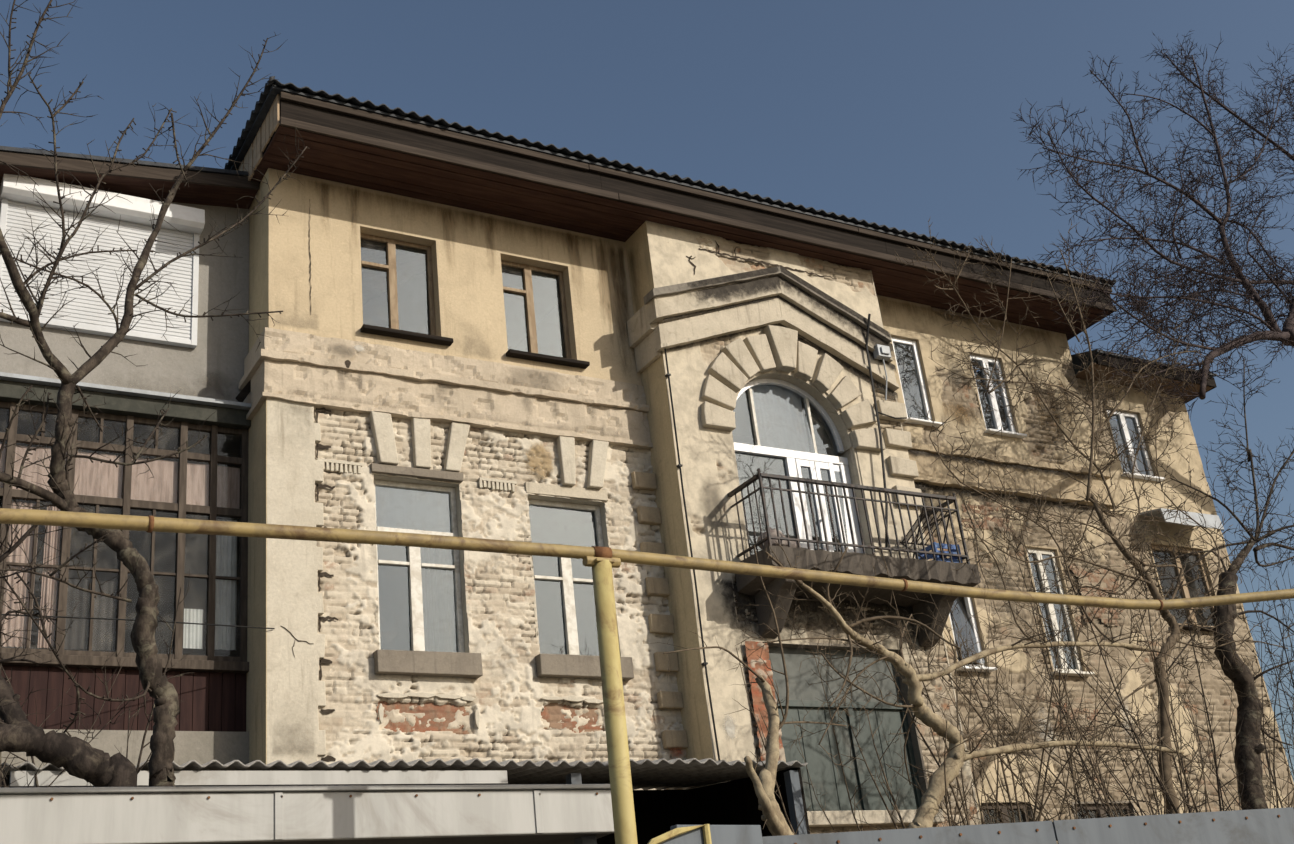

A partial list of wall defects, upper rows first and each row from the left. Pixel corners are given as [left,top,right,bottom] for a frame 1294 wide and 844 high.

crack [686,241,837,279]
spalling [526,444,553,477]
leakage [908,439,1095,478]
crack [281,626,314,657]
spalling [376,692,480,734]
spalling [540,695,604,733]